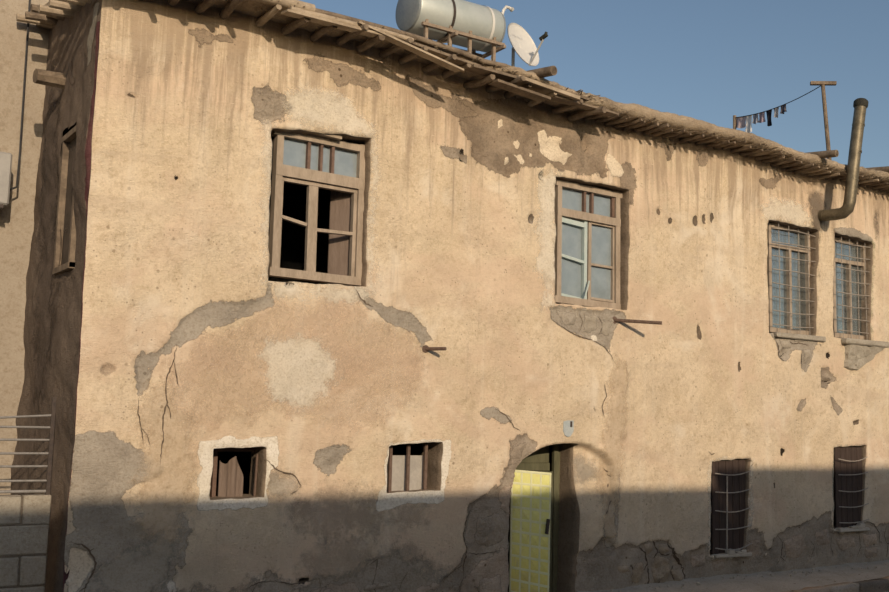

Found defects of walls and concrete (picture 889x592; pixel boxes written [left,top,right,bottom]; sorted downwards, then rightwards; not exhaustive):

spalling [406,74,634,181]
crack [137,345,179,467]
spalling [550,305,626,351]
spalling [770,333,843,415]
spalling [66,547,94,592]
spalling [436,433,537,592]
spalling [575,473,889,592]